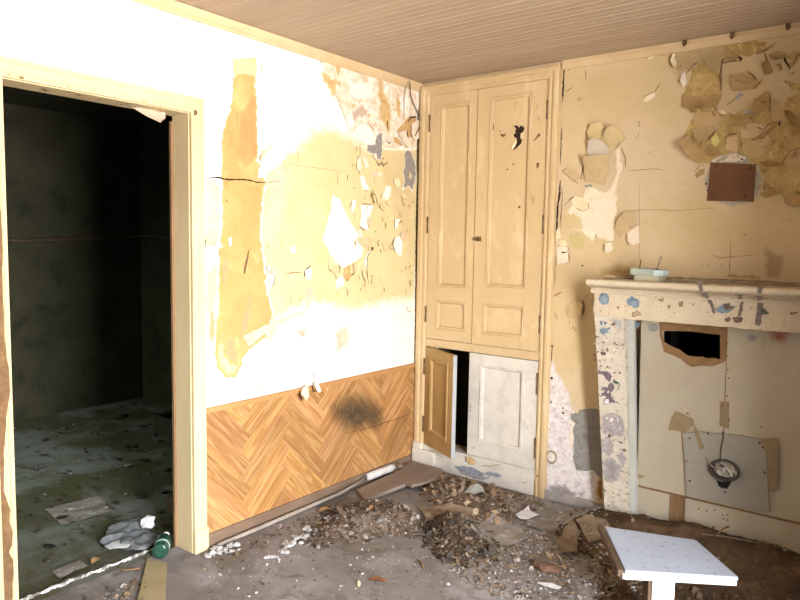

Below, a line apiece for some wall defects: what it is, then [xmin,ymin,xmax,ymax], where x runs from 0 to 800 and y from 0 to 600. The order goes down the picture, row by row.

peeling [205,176,232,346]
crack [205,175,279,183]
peeling [243,61,419,358]
peeling [493,119,524,150]
spalling [556,122,640,264]
leakage [336,399,379,426]
peeling [455,456,503,480]
peeling [537,320,627,502]